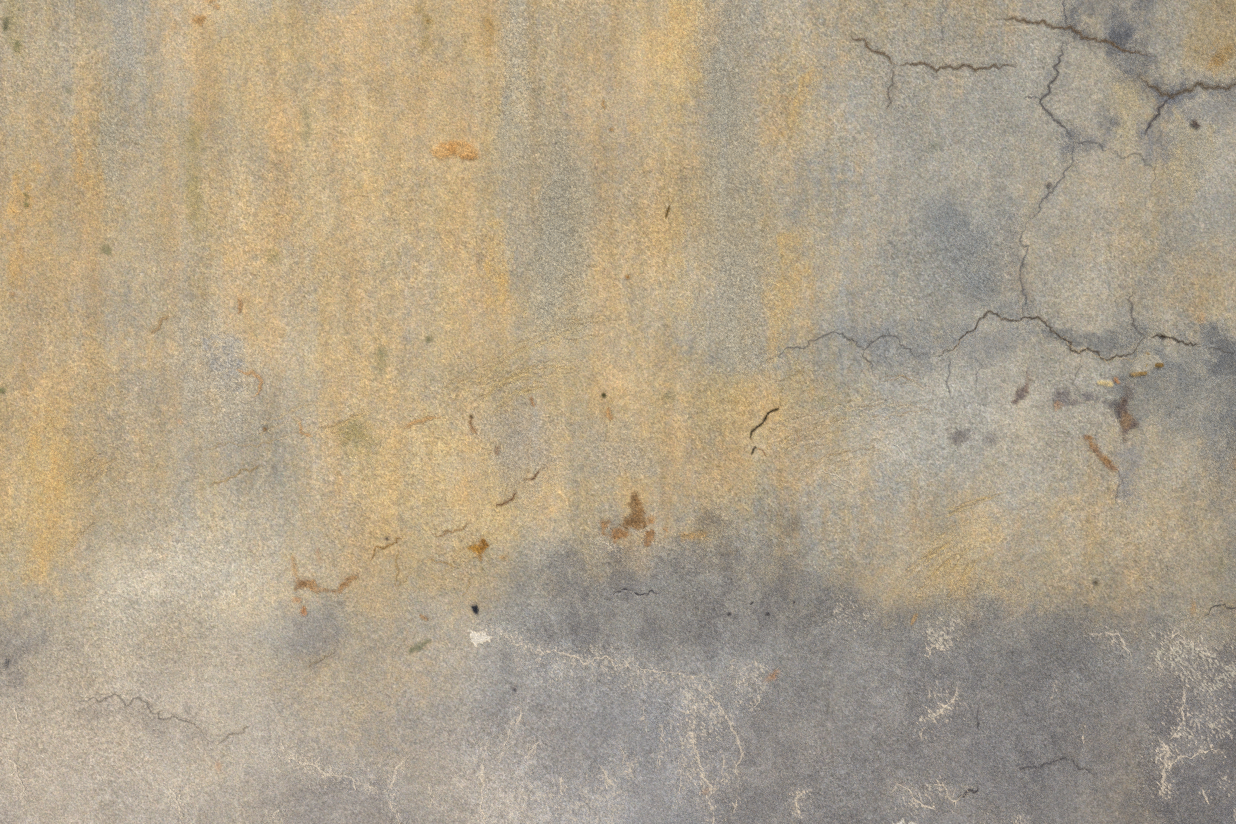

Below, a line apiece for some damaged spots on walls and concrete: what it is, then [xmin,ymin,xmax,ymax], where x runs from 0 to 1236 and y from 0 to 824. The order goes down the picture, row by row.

crack [852,37,1006,103]
crack [1009,7,1140,212]
crack [1146,81,1236,132]
crack [948,236,1218,388]
leakage [468,629,492,647]